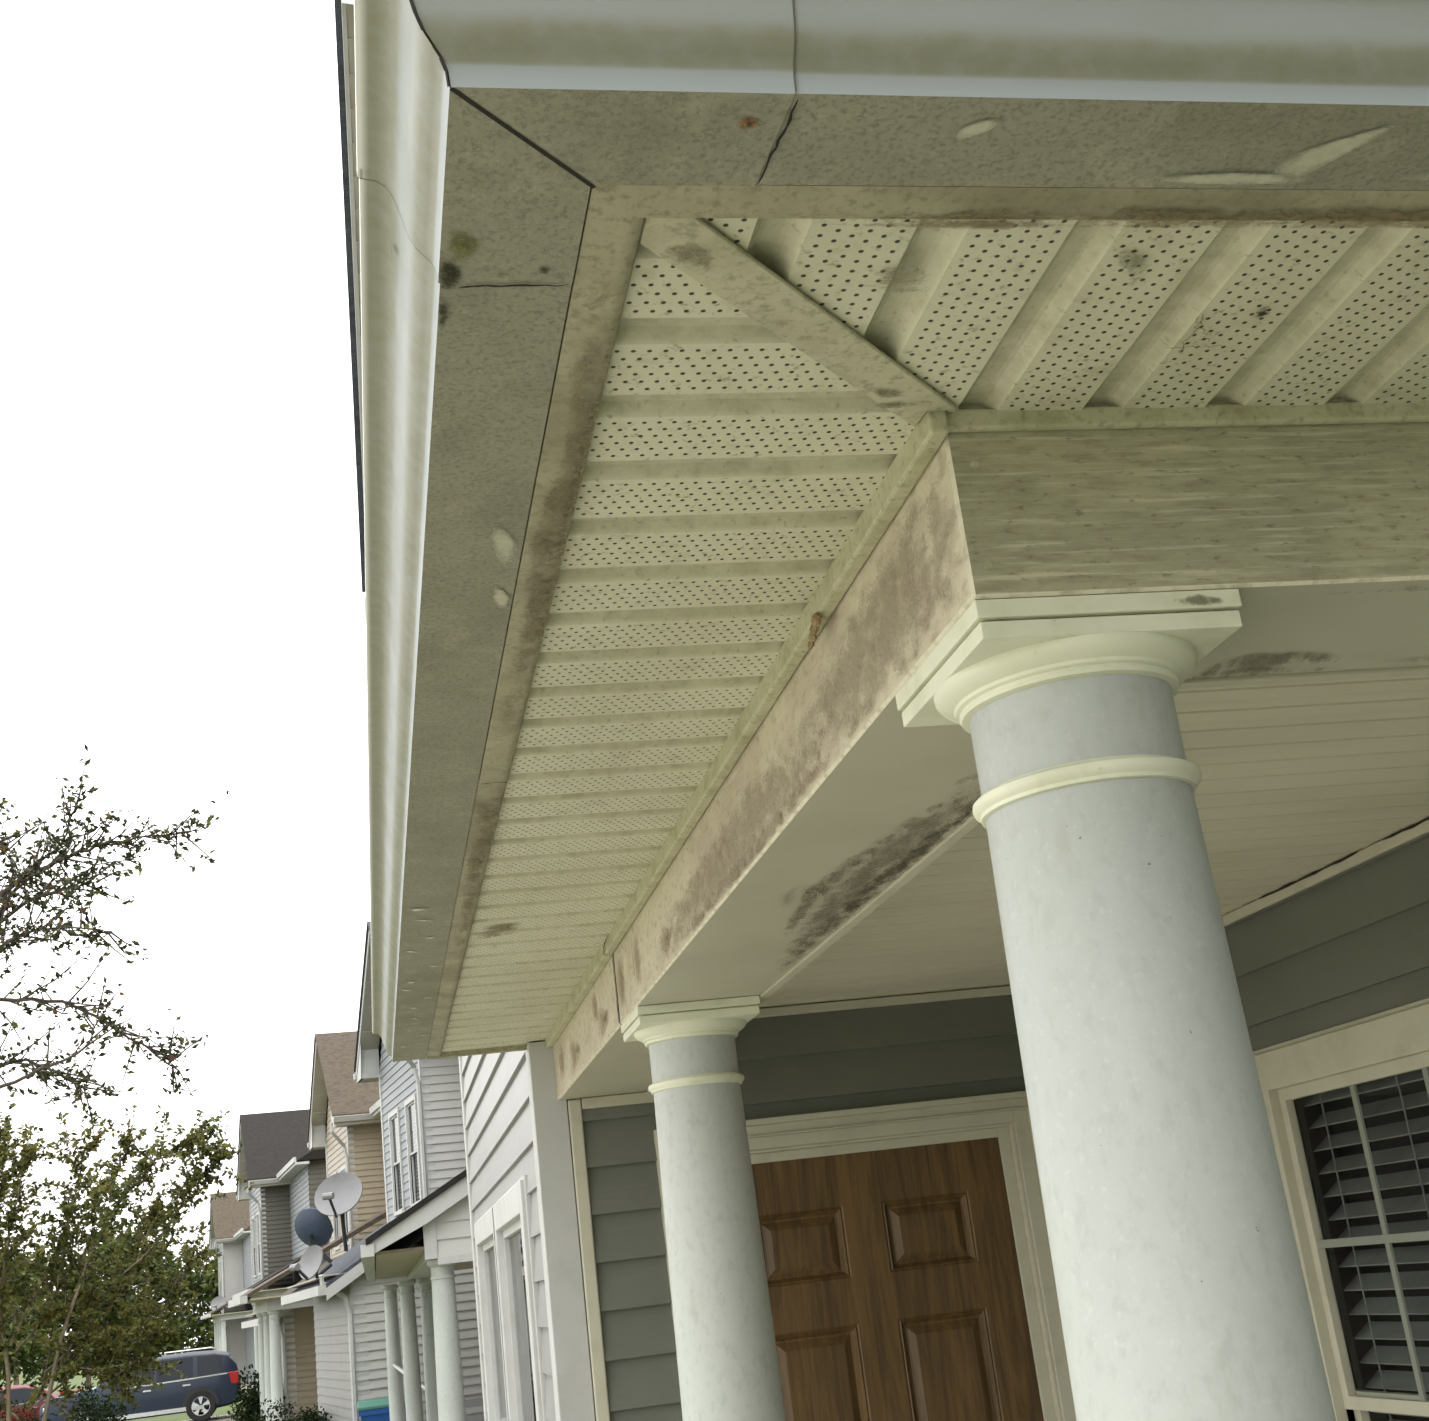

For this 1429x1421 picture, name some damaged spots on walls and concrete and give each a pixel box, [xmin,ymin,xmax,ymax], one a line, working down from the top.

crack [758,100,798,184]
peeling [1167,128,1388,184]
damp [439,235,476,325]
crack [459,282,569,290]
peeling [492,530,515,562]
peeling [494,589,508,607]
damp [666,496,951,948]
damp [786,777,980,964]